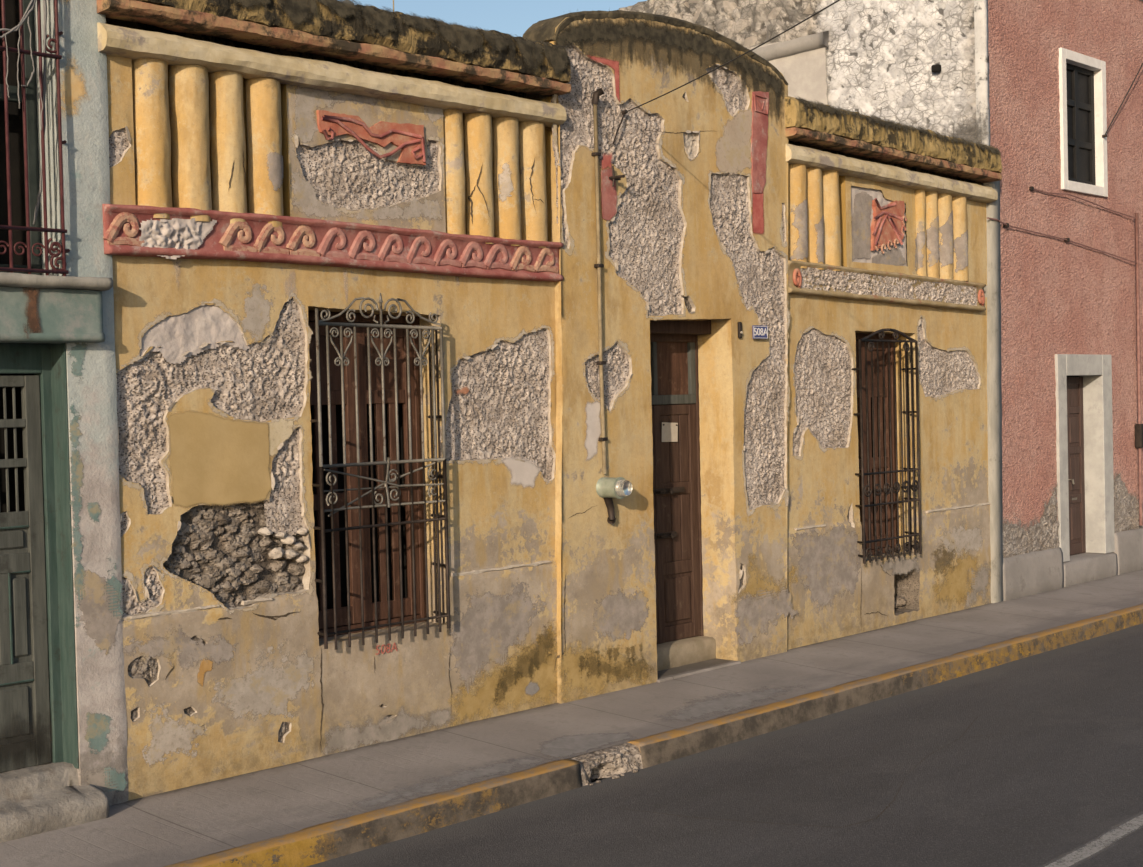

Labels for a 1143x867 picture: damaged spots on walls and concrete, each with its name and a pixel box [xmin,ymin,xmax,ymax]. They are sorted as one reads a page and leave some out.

spalling [267,86,445,221]
crack [468,162,490,224]
crack [529,159,544,211]
spalling [551,43,696,320]
spalling [706,64,982,517]
spalling [440,325,556,487]
spalling [582,340,633,460]
spalling [69,283,315,743]
spalling [1003,486,1060,558]
spalling [1114,473,1143,533]
water stain [323,625,652,755]
spalling [560,741,643,786]